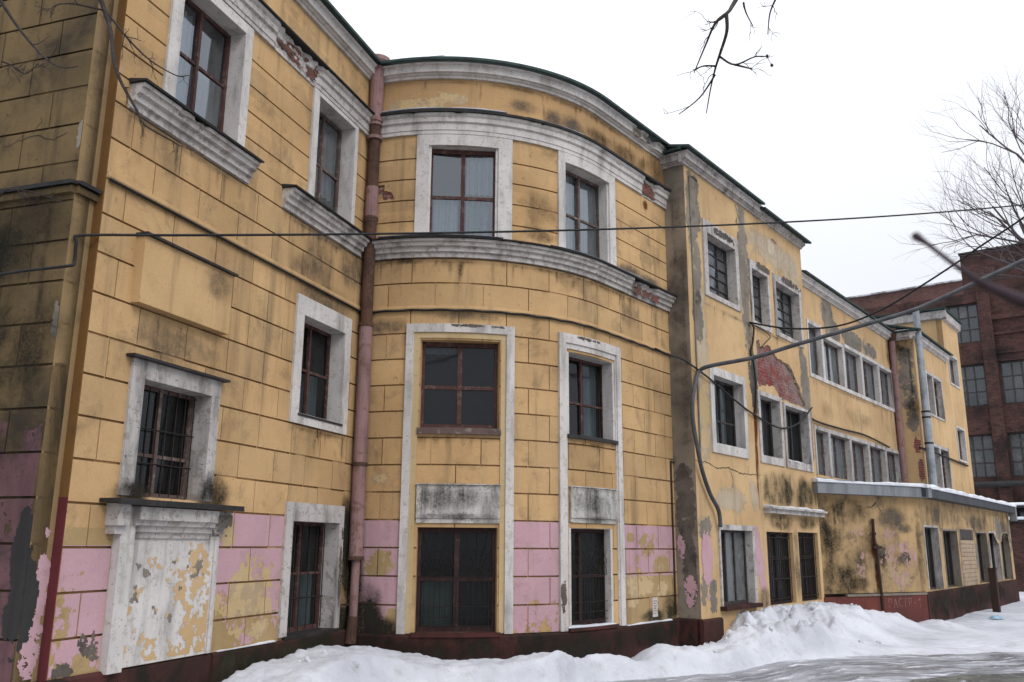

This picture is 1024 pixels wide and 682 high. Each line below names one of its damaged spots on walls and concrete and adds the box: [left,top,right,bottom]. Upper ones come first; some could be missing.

flaking render [684,170,815,462]
spalling [0,422,43,663]
peeling [122,513,282,663]
spalling [624,463,718,625]
damp [776,501,865,594]
damp [880,509,908,532]